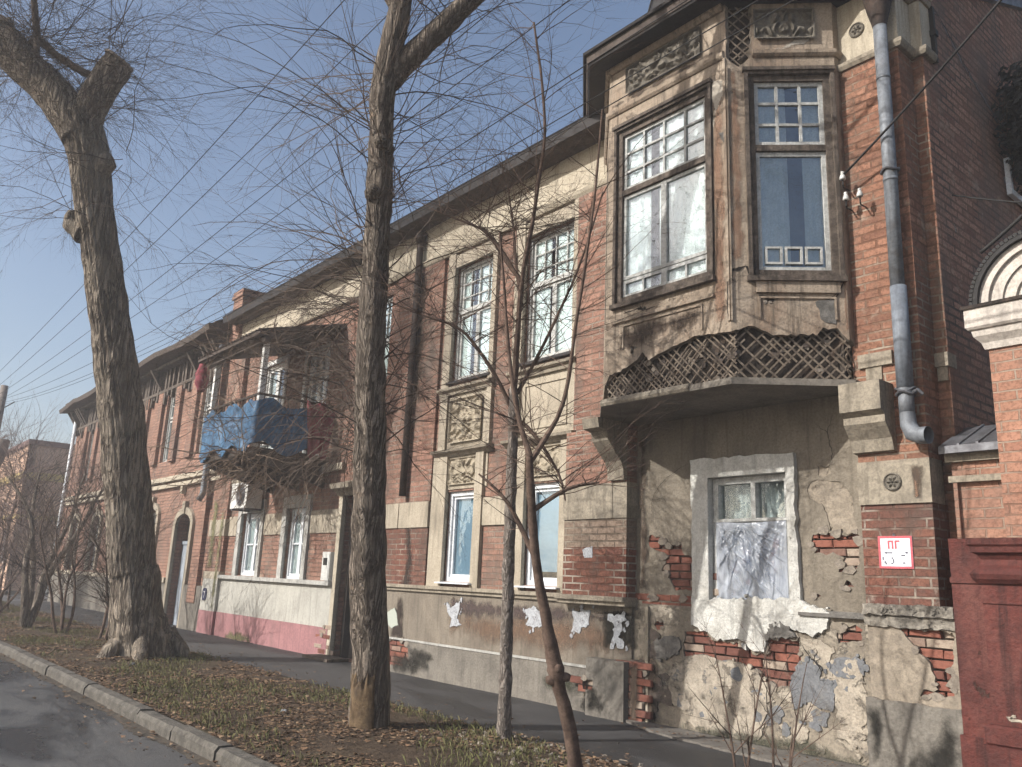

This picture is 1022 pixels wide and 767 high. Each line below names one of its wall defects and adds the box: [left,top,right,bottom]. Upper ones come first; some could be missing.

peeling [808,467,863,591]
spalling [635,535,692,606]
spalling [389,637,410,665]
spalling [615,617,838,723]
spalling [838,624,870,683]
spalling [901,629,960,702]